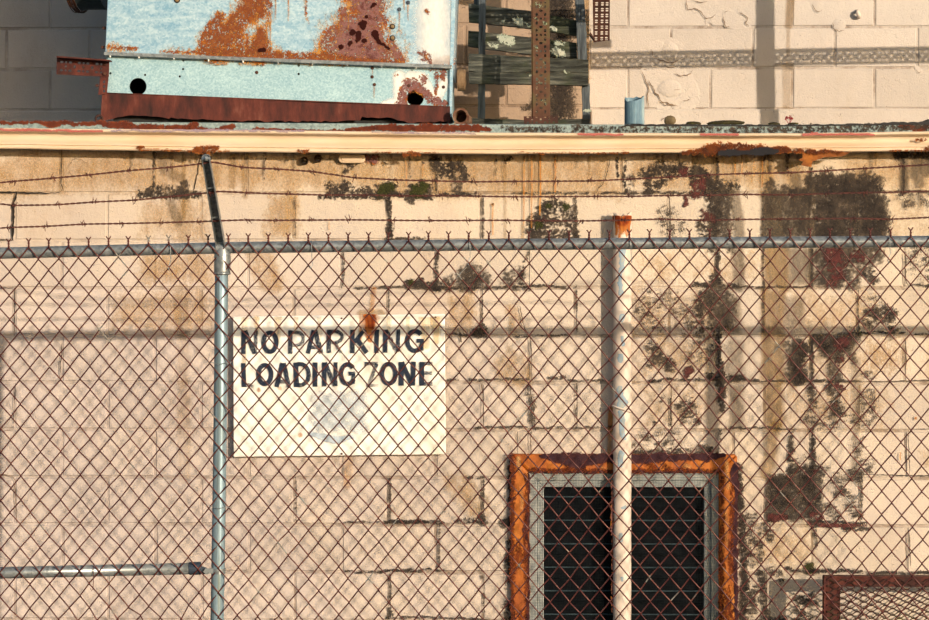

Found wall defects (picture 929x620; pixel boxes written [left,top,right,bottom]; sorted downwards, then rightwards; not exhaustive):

leakage [0,151,929,240]
rust [681,140,844,182]
leakage [354,251,578,342]
leakage [447,372,529,382]
leakage [475,375,610,430]
leakage [633,247,929,620]
leakage [345,478,485,620]
leakage [456,461,511,529]
rust [509,453,615,620]
rust [632,462,735,620]